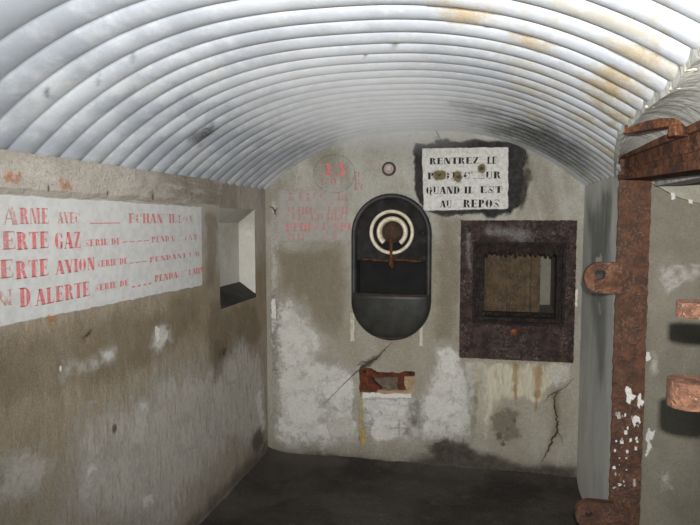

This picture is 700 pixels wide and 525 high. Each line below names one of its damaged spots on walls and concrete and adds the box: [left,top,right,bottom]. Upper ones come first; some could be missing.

leakage [495,128,582,164]
crack [322,342,392,405]
leakage [74,300,574,525]
crack [541,378,574,462]
peeling [645,428,655,457]